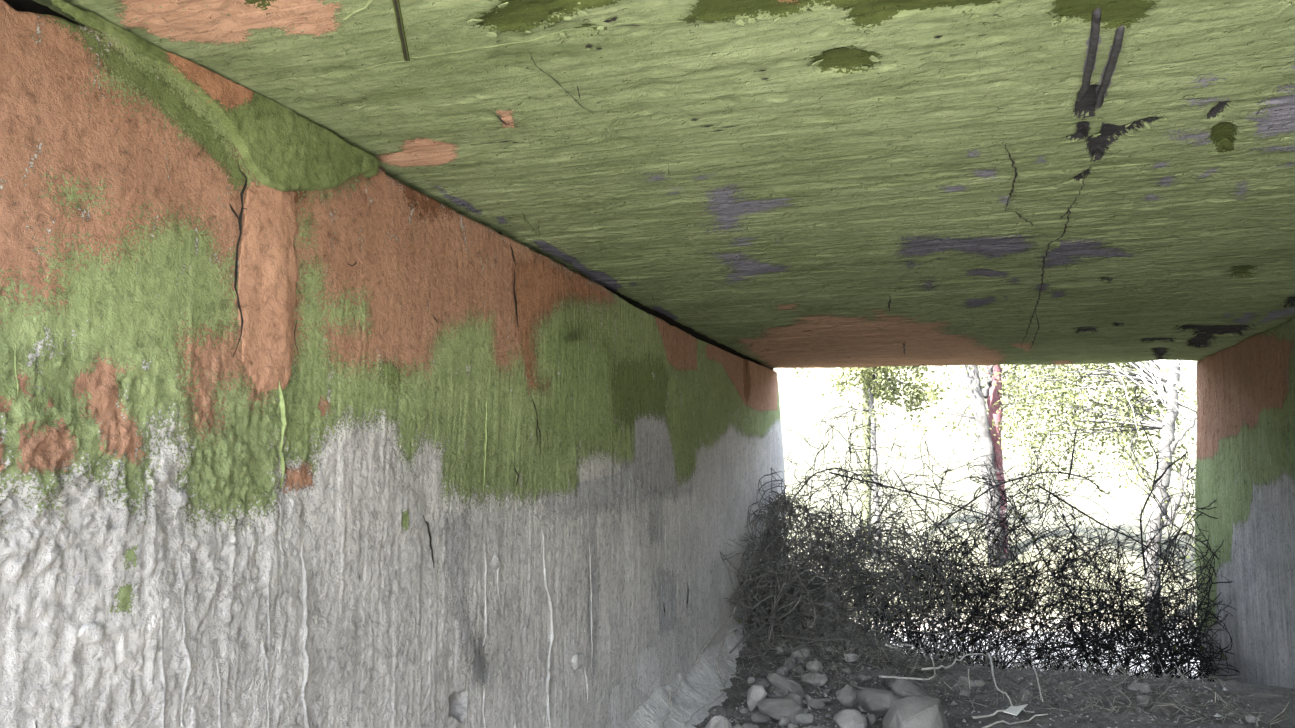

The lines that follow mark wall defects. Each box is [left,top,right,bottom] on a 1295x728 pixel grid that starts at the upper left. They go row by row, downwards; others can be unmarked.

spalling [244,0,279,16]
spalling [468,0,633,50]
spalling [682,0,1001,36]
spalling [808,45,882,74]
spalling [1048,0,1168,181]
crack [229,165,247,357]
crack [1005,145,1091,349]